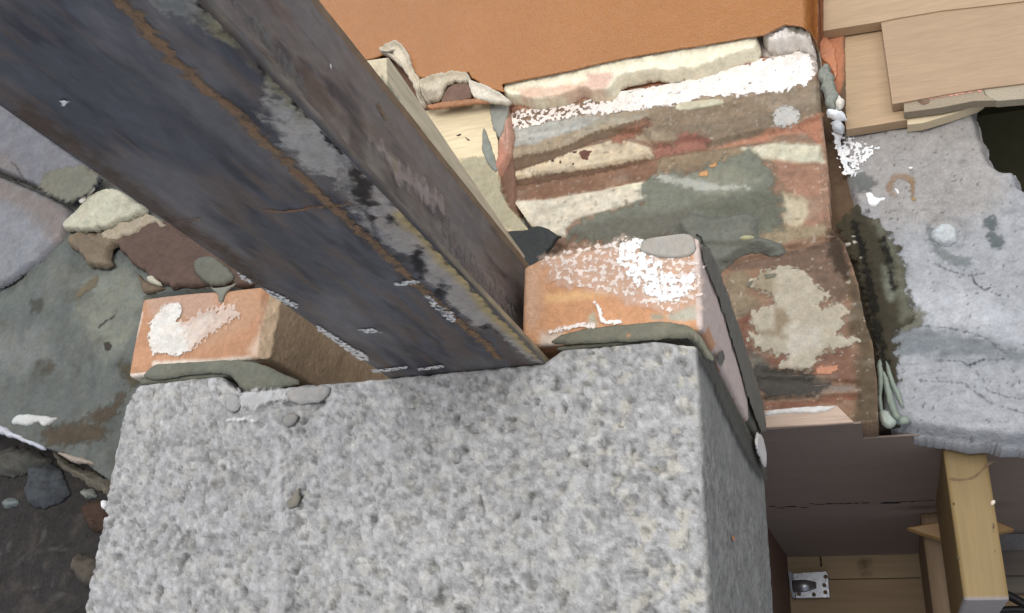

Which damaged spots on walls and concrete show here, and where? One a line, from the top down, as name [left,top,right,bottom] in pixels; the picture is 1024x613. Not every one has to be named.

corrosion [114,0,502,360]
efflorescence [147,302,240,356]
efflorescence [541,236,704,334]
damp [828,231,849,278]
damp [851,220,982,379]